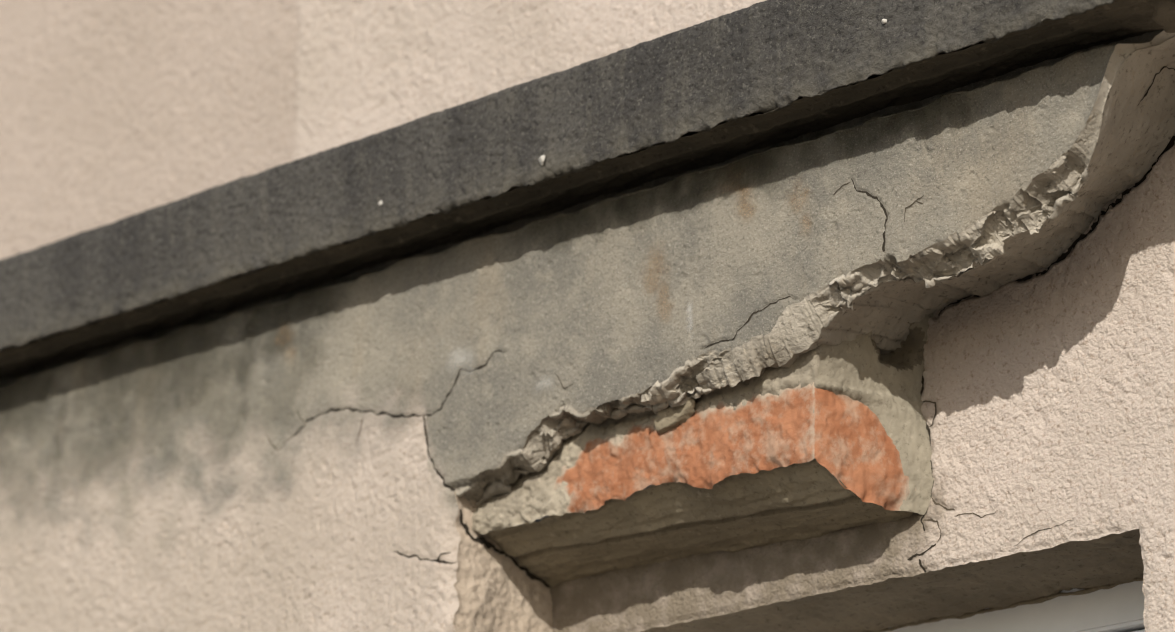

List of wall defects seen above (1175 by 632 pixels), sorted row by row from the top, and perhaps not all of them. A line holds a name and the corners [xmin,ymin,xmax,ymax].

crack [1138,66,1175,105]
crack [833,178,924,252]
spalling [883,107,1103,285]
crack [1016,136,1175,282]
crack [268,350,551,588]
peeling [455,289,836,534]
crack [907,375,994,572]